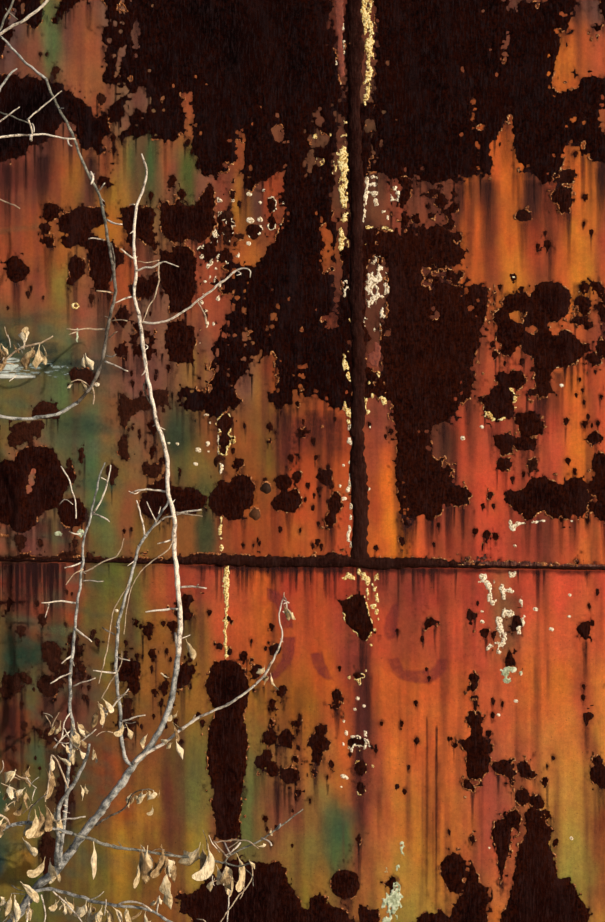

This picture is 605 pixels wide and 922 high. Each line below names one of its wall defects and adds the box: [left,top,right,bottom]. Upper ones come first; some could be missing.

corrosion [0,0,605,685]
peeling [508,520,545,531]
corrosion [111,592,345,843]
corrosion [347,735,378,795]
corrosion [416,670,594,922]
corrosion [589,752,605,790]
corrosion [38,831,56,894]
corrosion [175,852,381,922]
corrosion [380,876,400,893]